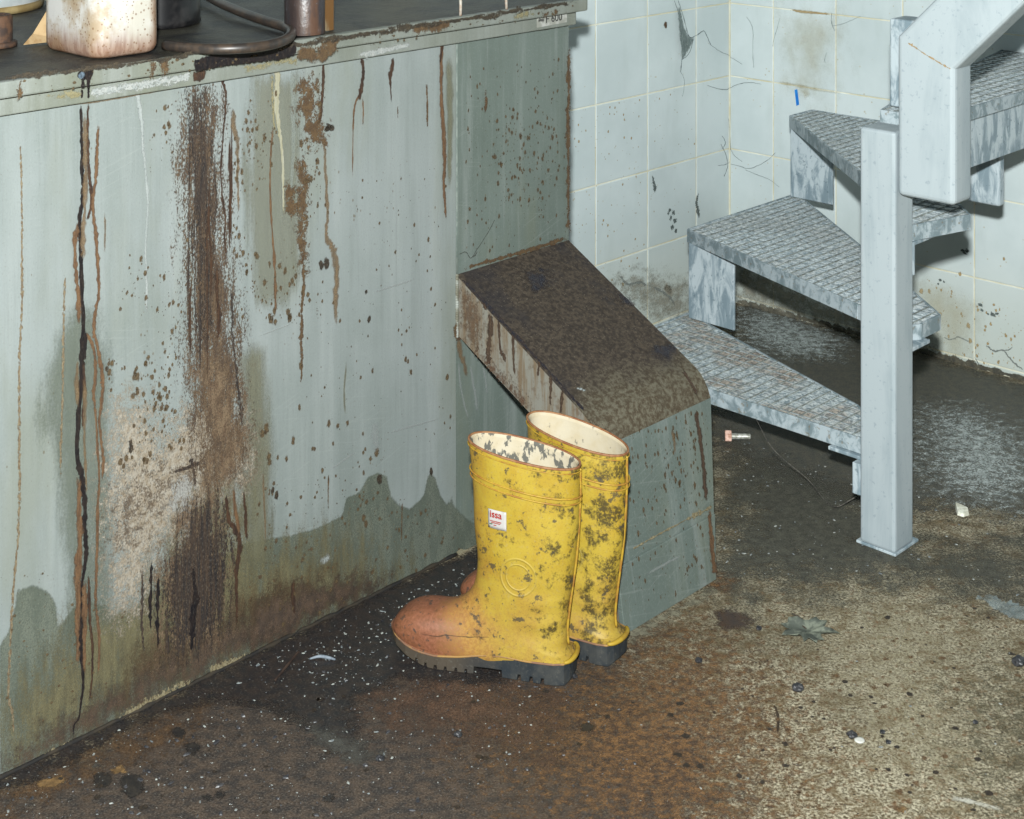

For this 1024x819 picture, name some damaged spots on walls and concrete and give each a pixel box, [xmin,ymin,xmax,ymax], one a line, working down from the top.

rust [393,20,483,51]
water stain [0,316,476,772]
rust [40,39,460,704]
rust [453,282,584,413]